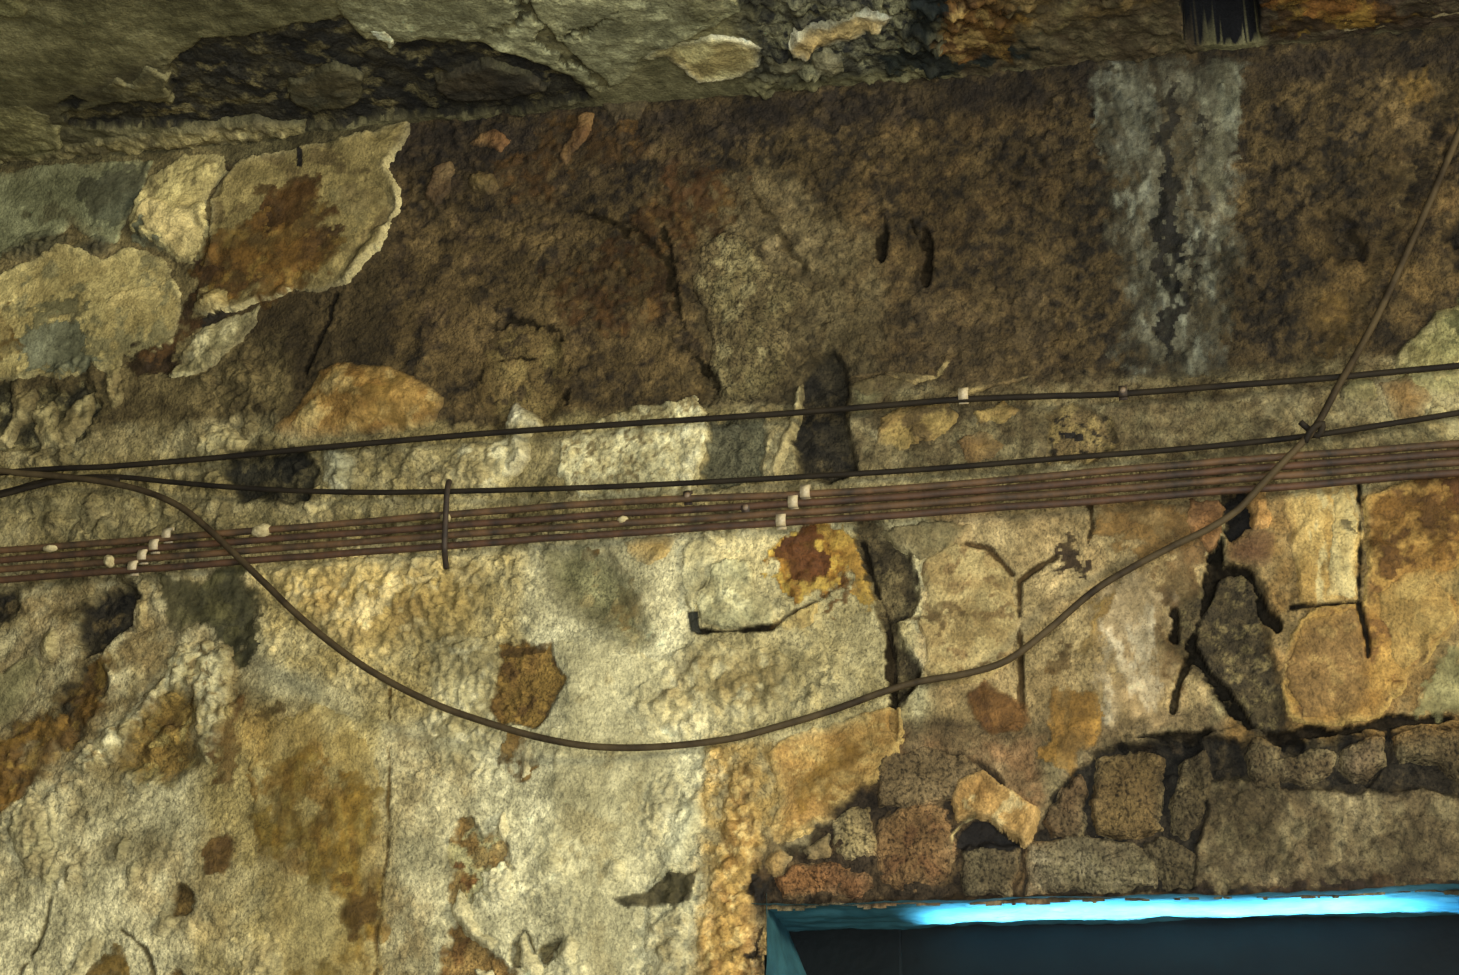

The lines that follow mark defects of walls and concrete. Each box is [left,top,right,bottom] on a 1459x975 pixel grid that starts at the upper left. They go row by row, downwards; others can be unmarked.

efflorescence [1093,57,1243,377]
flaking render [0,591,20,624]
flaking render [56,581,141,749]
flaking render [124,690,198,783]
crack [374,689,392,975]
crack [688,601,816,634]
flaking render [763,477,1459,904]
crack [1138,484,1453,747]